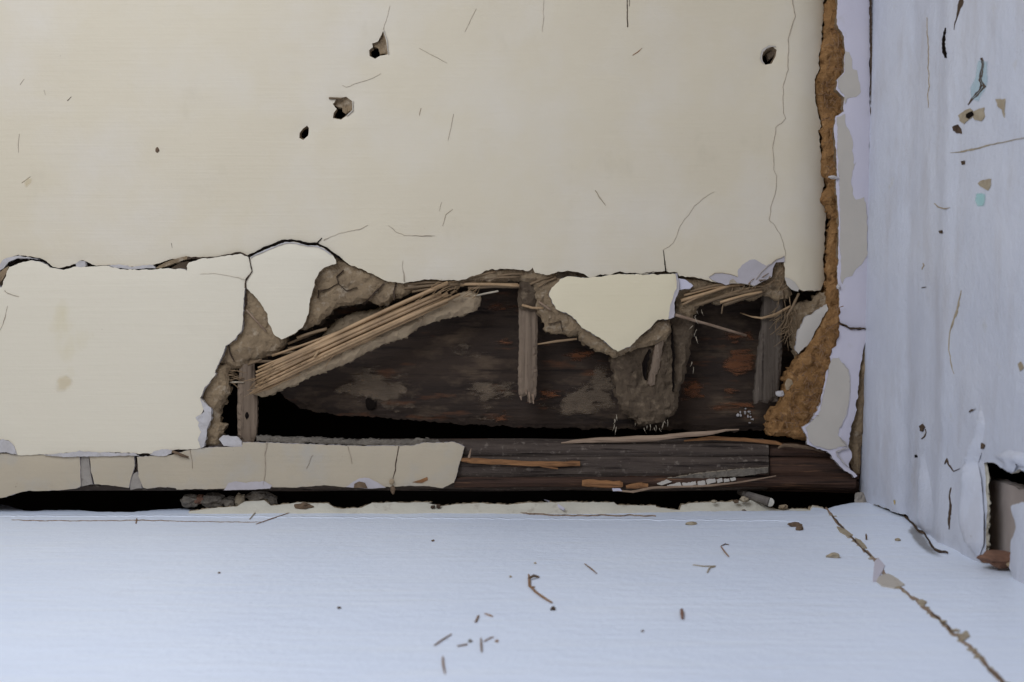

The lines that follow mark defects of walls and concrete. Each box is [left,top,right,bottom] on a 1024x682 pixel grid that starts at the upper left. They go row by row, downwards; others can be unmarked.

crack [769,0,796,256]
peeling [952,99,1006,134]
crack [0,225,432,330]
spalling [195,0,868,474]
peeling [978,179,991,191]
peeling [657,467,768,486]
crack [878,458,960,554]
crack [825,507,1006,682]